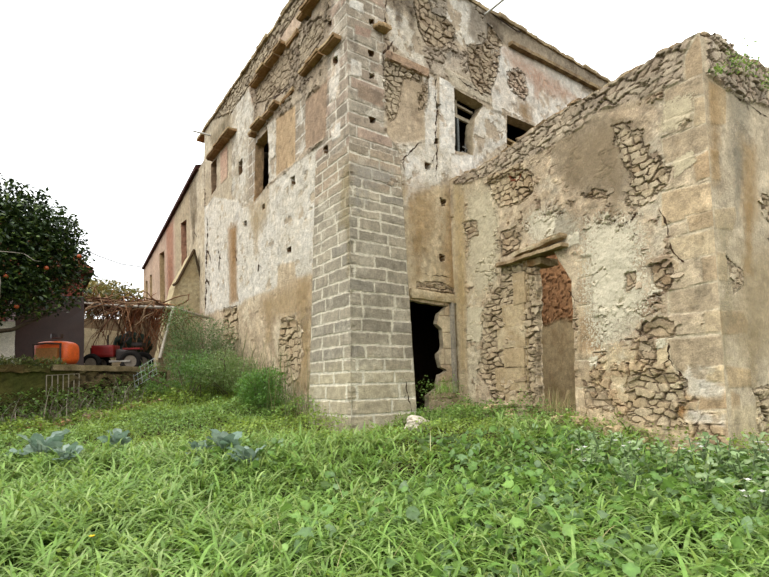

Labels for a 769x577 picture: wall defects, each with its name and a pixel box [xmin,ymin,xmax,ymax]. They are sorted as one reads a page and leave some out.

spalling [214,0,332,120]
spalling [369,61,438,122]
spalling [413,0,457,49]
spalling [466,25,529,101]
peeling [463,90,697,429]
crack [658,209,685,288]
spalling [278,316,305,386]
spalling [752,384,769,461]